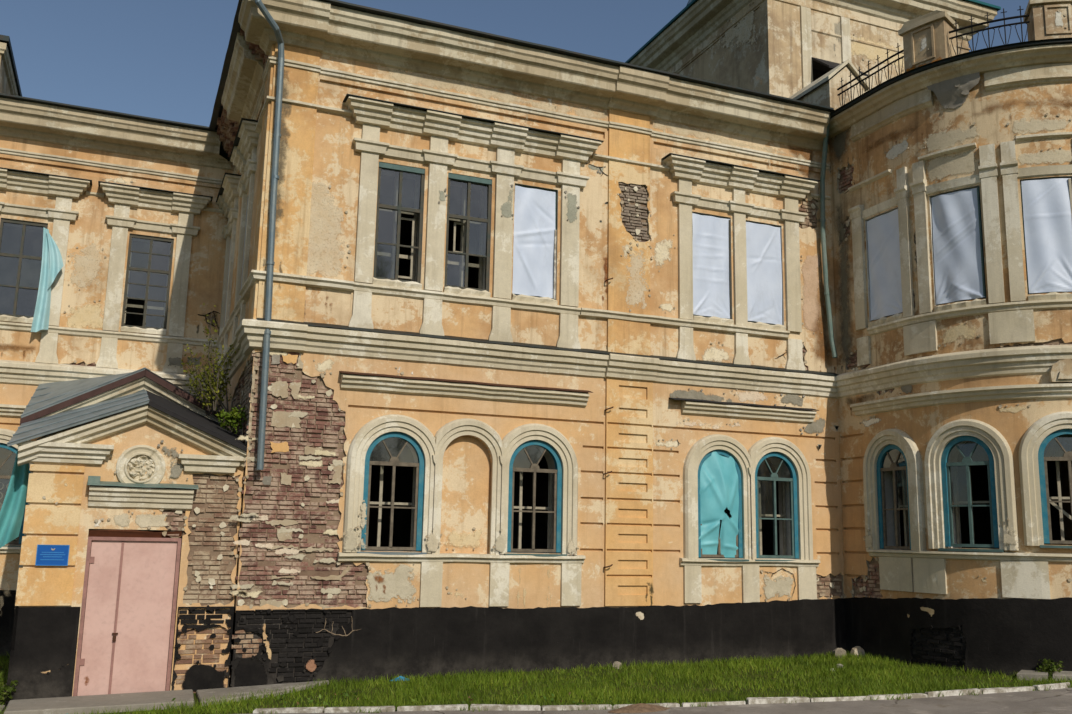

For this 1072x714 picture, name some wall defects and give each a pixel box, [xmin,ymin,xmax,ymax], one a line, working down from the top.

flaking render [605,182,676,313]
flaking render [798,197,820,228]
flaking render [147,350,371,693]
flaking render [816,557,882,599]